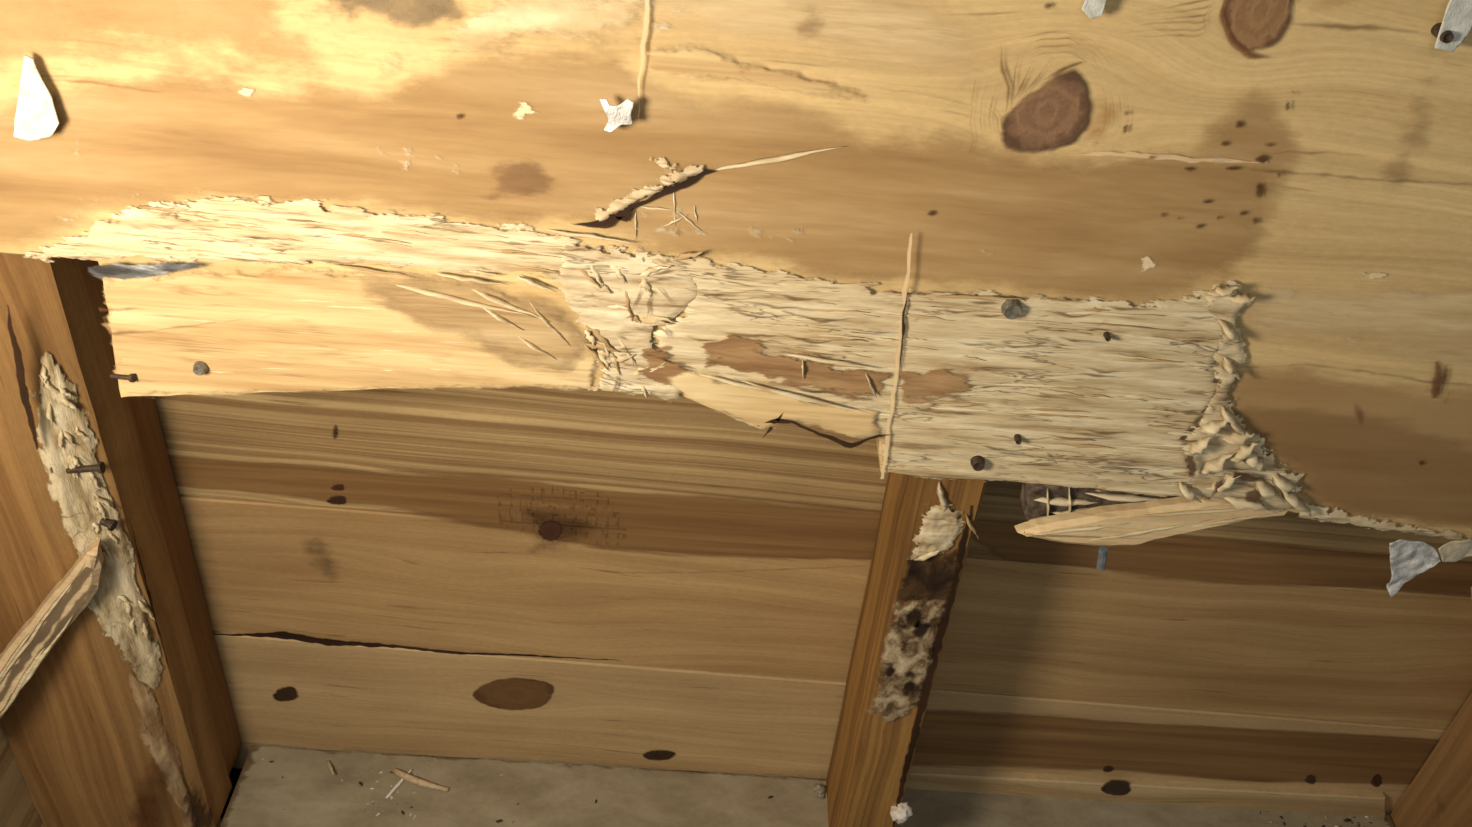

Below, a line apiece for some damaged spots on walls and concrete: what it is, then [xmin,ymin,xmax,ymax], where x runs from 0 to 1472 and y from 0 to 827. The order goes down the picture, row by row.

leakage [0,61,1288,299]
crack [574,169,715,229]
peeling [634,192,703,240]
peeling [578,251,704,325]
crack [7,305,38,450]
peeling [583,325,666,399]
crack [757,413,893,448]
peeling [1178,406,1311,516]
leakage [169,457,881,559]
leakage [972,522,1472,595]
crack [213,631,619,661]
leakage [869,549,1440,784]